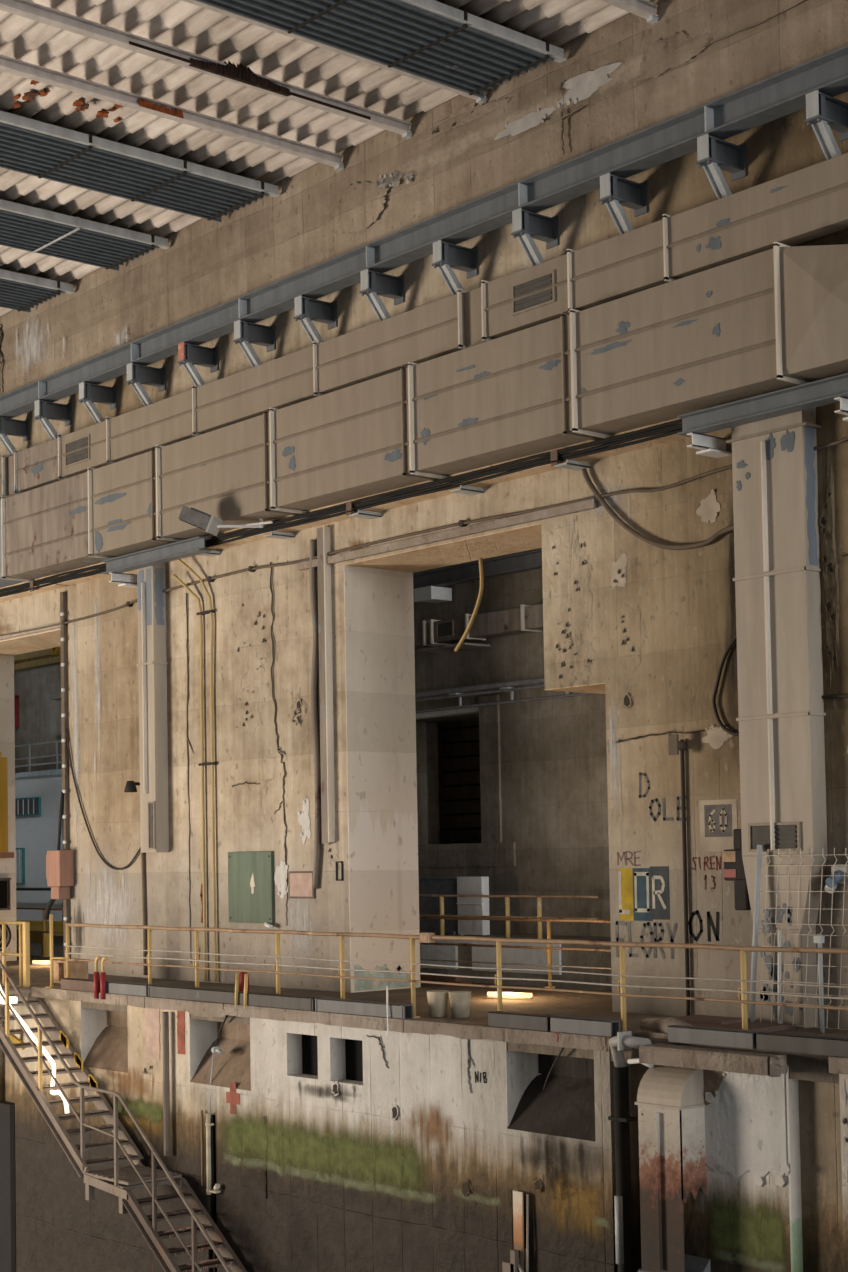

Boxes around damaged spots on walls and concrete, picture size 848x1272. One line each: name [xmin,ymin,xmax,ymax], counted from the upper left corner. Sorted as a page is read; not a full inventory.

corrosion [12,80,50,109]
corrosion [73,99,124,123]
corrosion [138,98,184,118]
peeling [494,62,622,140]
crack [232,562,288,926]
water stain [232,1120,434,1200]